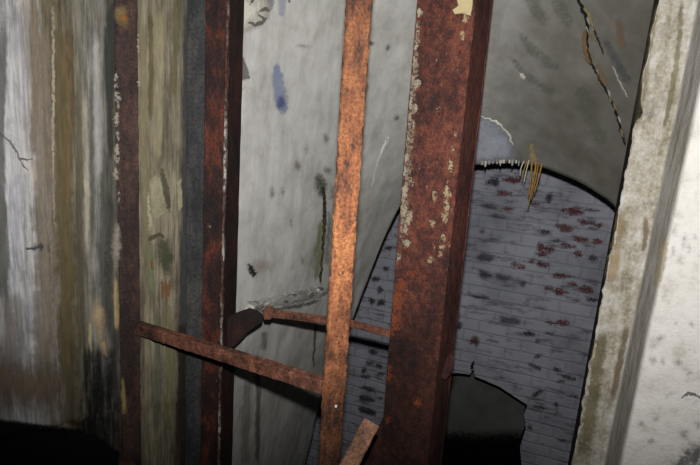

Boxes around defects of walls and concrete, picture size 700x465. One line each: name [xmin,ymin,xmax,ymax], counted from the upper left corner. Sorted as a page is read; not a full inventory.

crack [577,0,629,145]
water stain [664,7,683,125]
crack [0,133,32,170]
water stain [0,5,119,465]
water stain [316,169,333,195]
peeling [384,8,423,260]
peeling [429,186,452,228]
spalling [476,116,513,162]
water stain [655,242,666,285]
spalling [245,286,328,311]
peeling [358,349,384,416]
water stain [611,328,628,396]